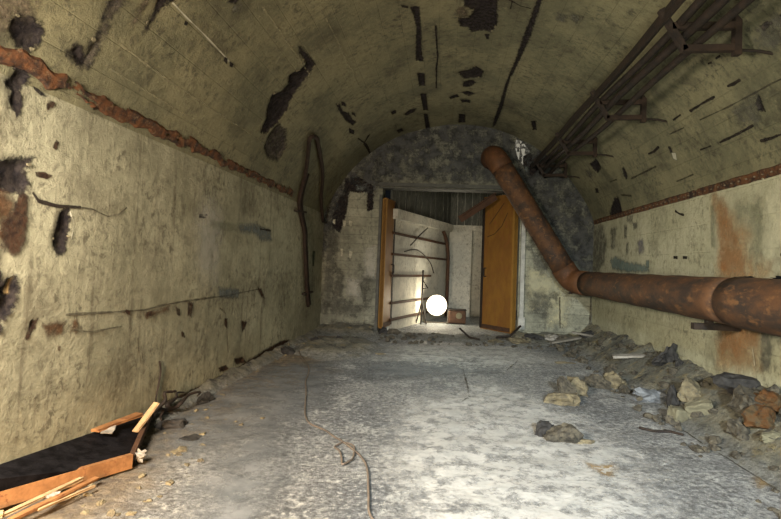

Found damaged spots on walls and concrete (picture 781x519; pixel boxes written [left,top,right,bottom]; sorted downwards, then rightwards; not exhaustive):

spalling [0,0,45,53]
spalling [456,0,498,39]
rust [0,45,293,197]
spalling [261,46,315,161]
spalling [0,156,52,256]
spalling [53,208,74,257]
rust [594,163,781,225]
spalling [0,271,20,334]